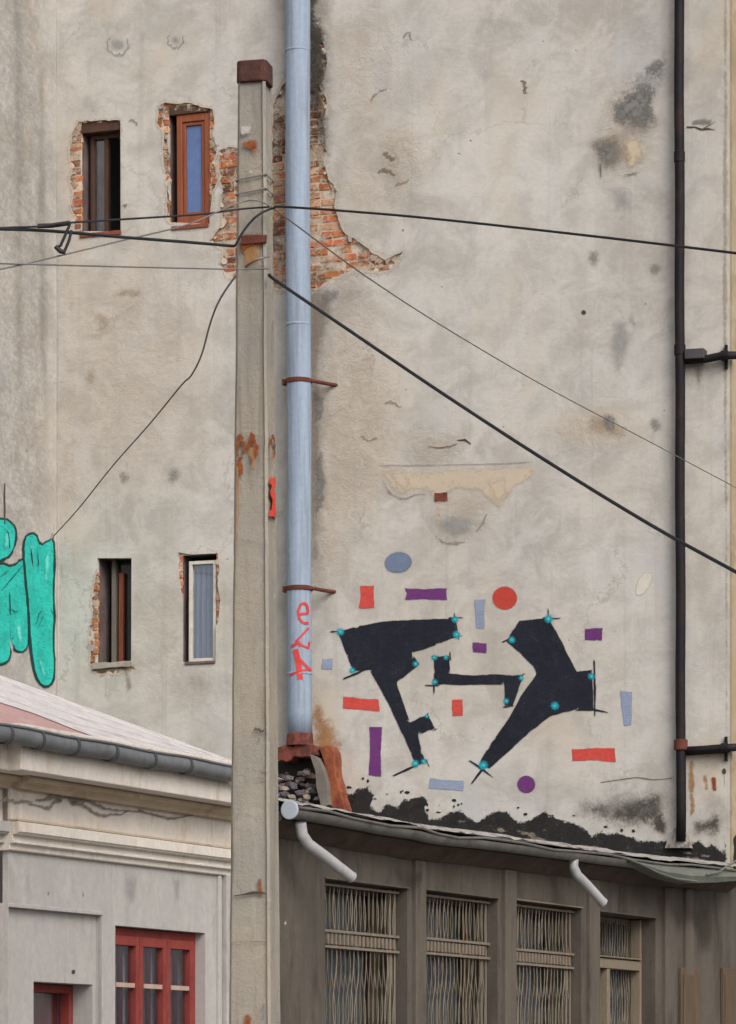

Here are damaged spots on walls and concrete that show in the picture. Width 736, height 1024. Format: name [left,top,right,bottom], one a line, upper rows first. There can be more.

spalling [67,118,122,232]
spalling [156,100,237,281]
spalling [272,76,286,292]
spalling [310,39,404,294]
rust [236,432,276,556]
peeling [380,462,533,515]
spalling [87,570,135,678]
spalling [178,552,220,623]
rust [314,709,336,766]
damp [593,797,665,833]
rust [689,762,716,813]
damp [696,816,718,832]